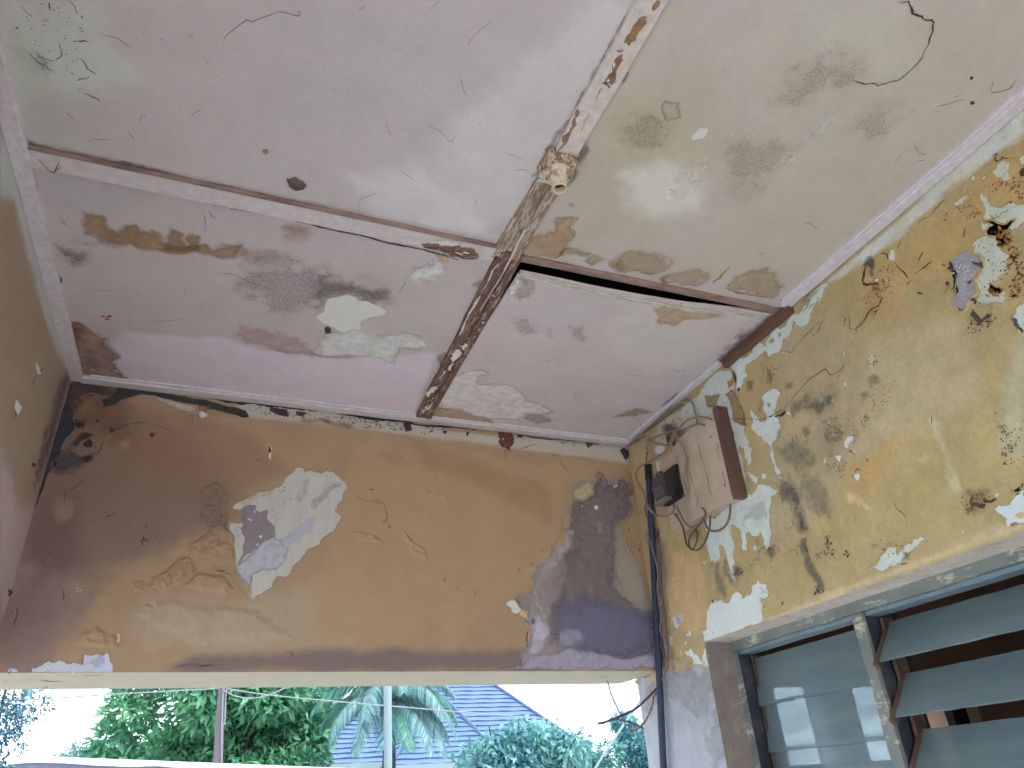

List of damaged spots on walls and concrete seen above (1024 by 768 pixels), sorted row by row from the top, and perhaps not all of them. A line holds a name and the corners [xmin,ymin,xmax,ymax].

crack [852,1,935,86]
leakage [239,257,446,315]
peeling [316,294,386,333]
crack [296,221,458,260]
peeling [420,240,770,414]
flaking render [948,152,1024,334]
leakage [35,322,554,507]
leakage [994,408,1024,467]
peeling [228,466,349,602]
flaking render [634,280,831,768]
leakage [715,481,834,595]
peeling [866,534,929,575]